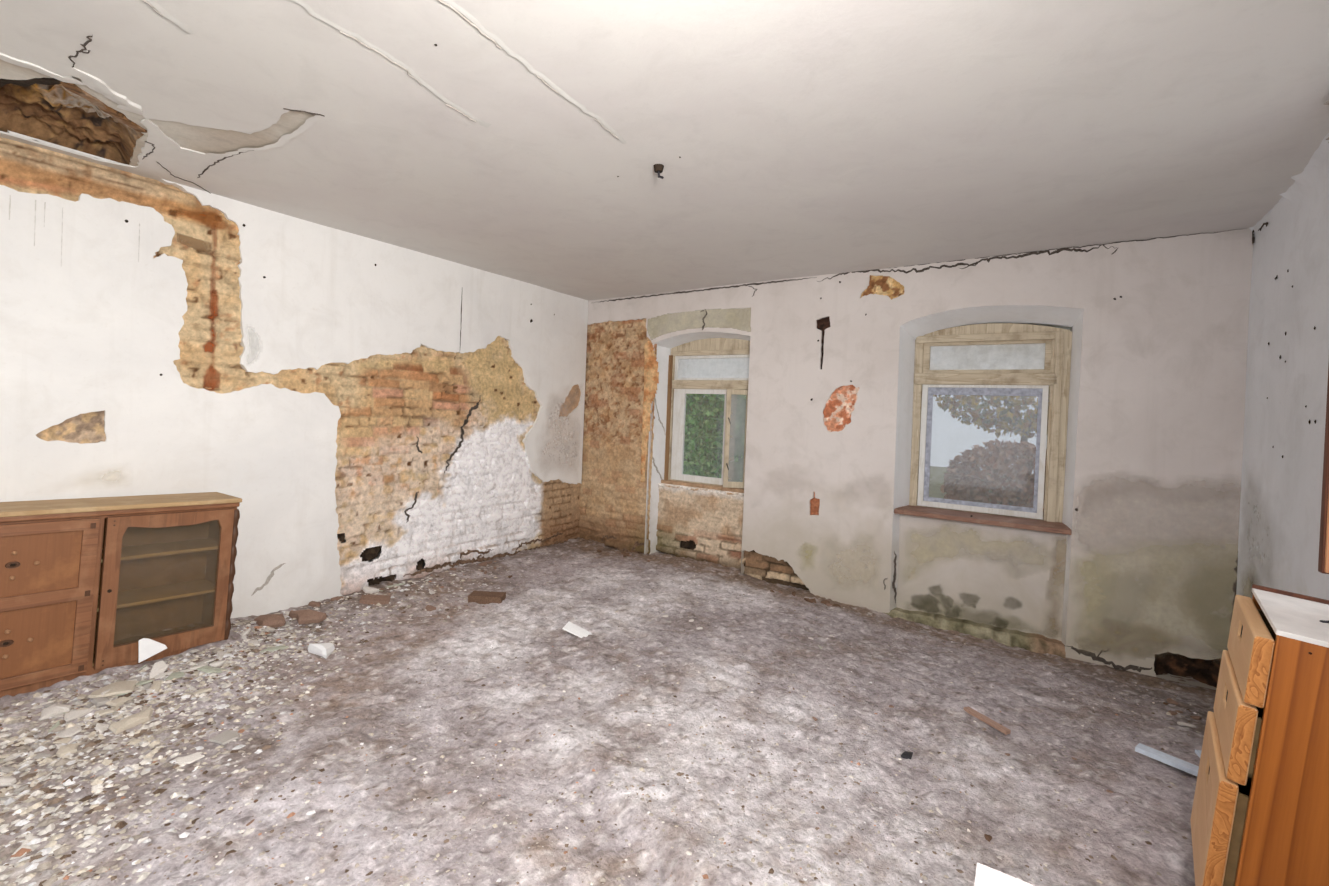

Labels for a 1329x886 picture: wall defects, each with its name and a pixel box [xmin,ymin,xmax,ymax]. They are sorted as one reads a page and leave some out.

crack [68,35,93,67]
crack [284,0,492,128]
crack [436,0,626,144]
flaking render [0,53,744,596]
spalling [860,275,905,300]
crack [594,222,1268,330]
spalling [823,385,860,432]
leakage [1053,483,1254,653]
crack [1064,645,1152,672]
spalling [1154,652,1221,688]